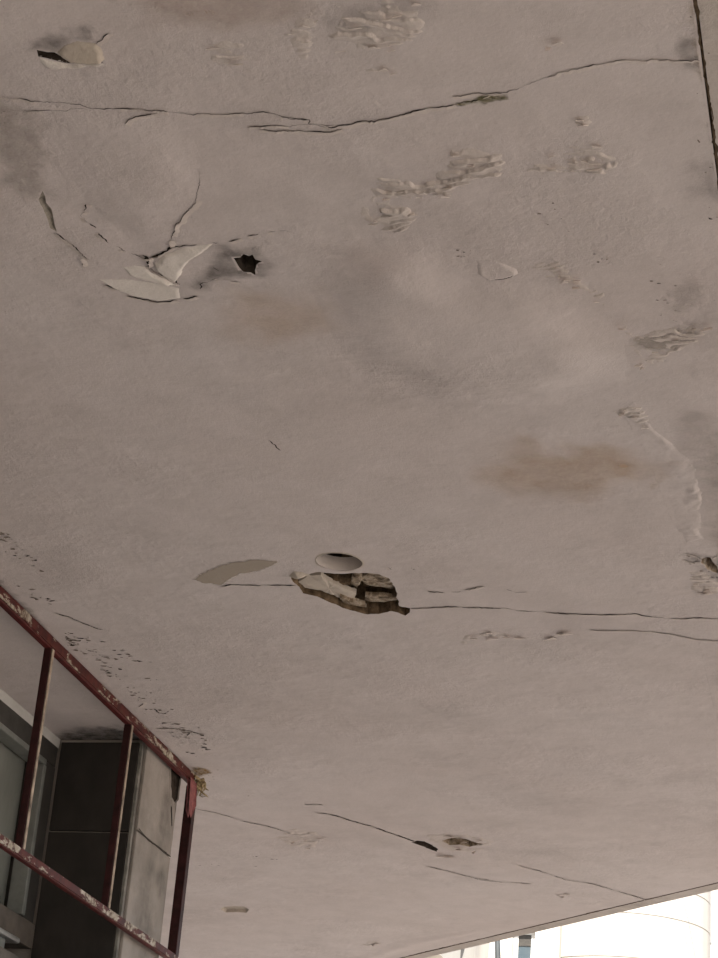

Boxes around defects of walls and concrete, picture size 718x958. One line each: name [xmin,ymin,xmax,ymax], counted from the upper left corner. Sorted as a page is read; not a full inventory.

flaking render [37,50,70,63]
crack [0,59,700,136]
crack [53,182,240,305]
peeling [195,560,277,585]
spalling [289,571,410,616]
crack [412,586,718,642]
peeling [688,556,718,595]
peeling [0,586,211,804]
crack [306,804,413,842]
peeling [412,833,494,858]